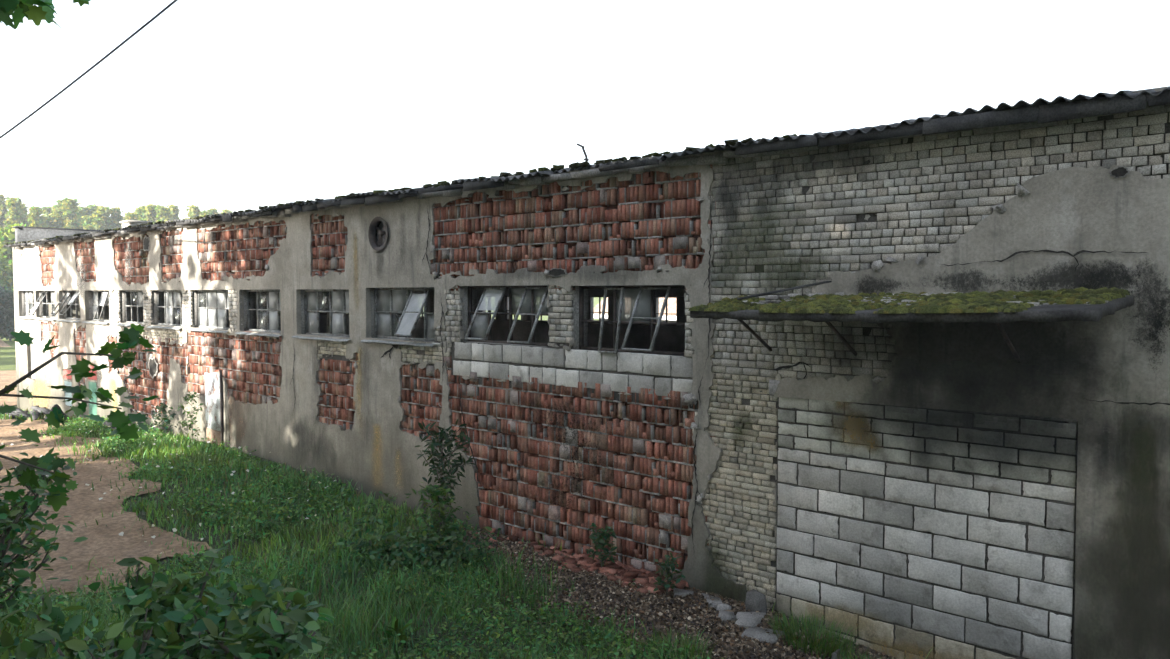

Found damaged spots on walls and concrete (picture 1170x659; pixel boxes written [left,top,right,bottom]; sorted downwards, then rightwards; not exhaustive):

flaking render [39,244,56,286]
flaking render [74,240,96,282]
flaking render [311,214,348,277]
damp [855,276,909,294]
crack [943,250,1147,271]
flaking render [41,321,59,358]
flaking render [73,326,86,361]
flaking render [108,220,287,420]
flaking render [393,105,1170,609]
damp [924,259,1170,370]
flaking render [317,339,359,431]
crack [1084,397,1170,405]